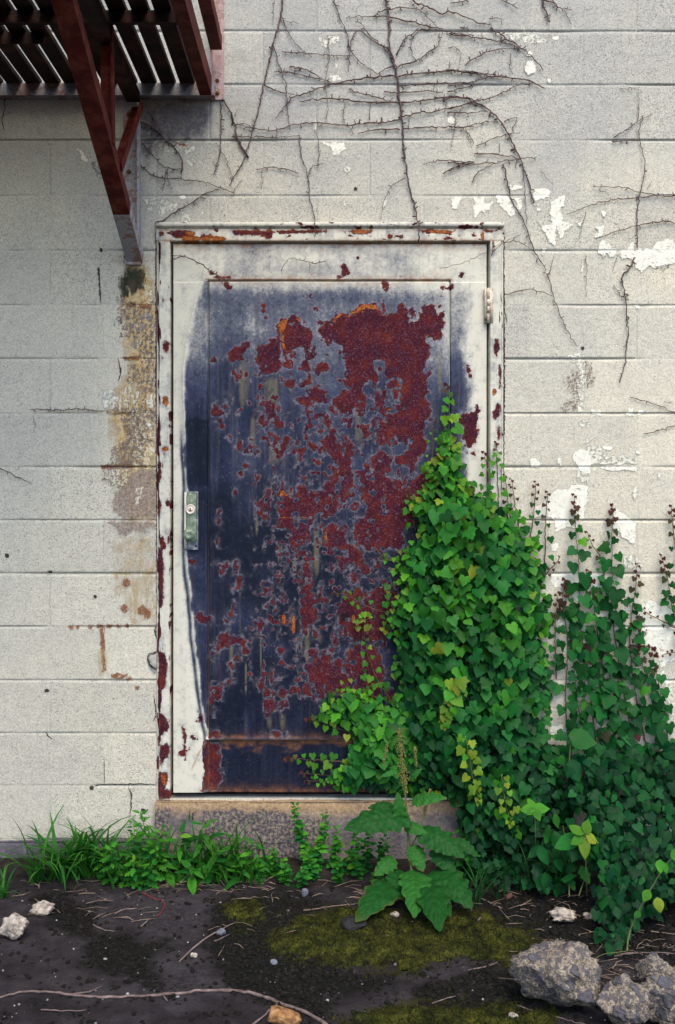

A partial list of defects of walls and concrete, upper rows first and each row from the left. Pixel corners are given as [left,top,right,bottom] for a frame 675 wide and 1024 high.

peeling [451,184,675,272]
water stain [118,276,145,297]
peeling [532,347,641,551]
water stain [108,468,157,535]
peeling [613,508,644,571]
corrosion [68,605,151,690]